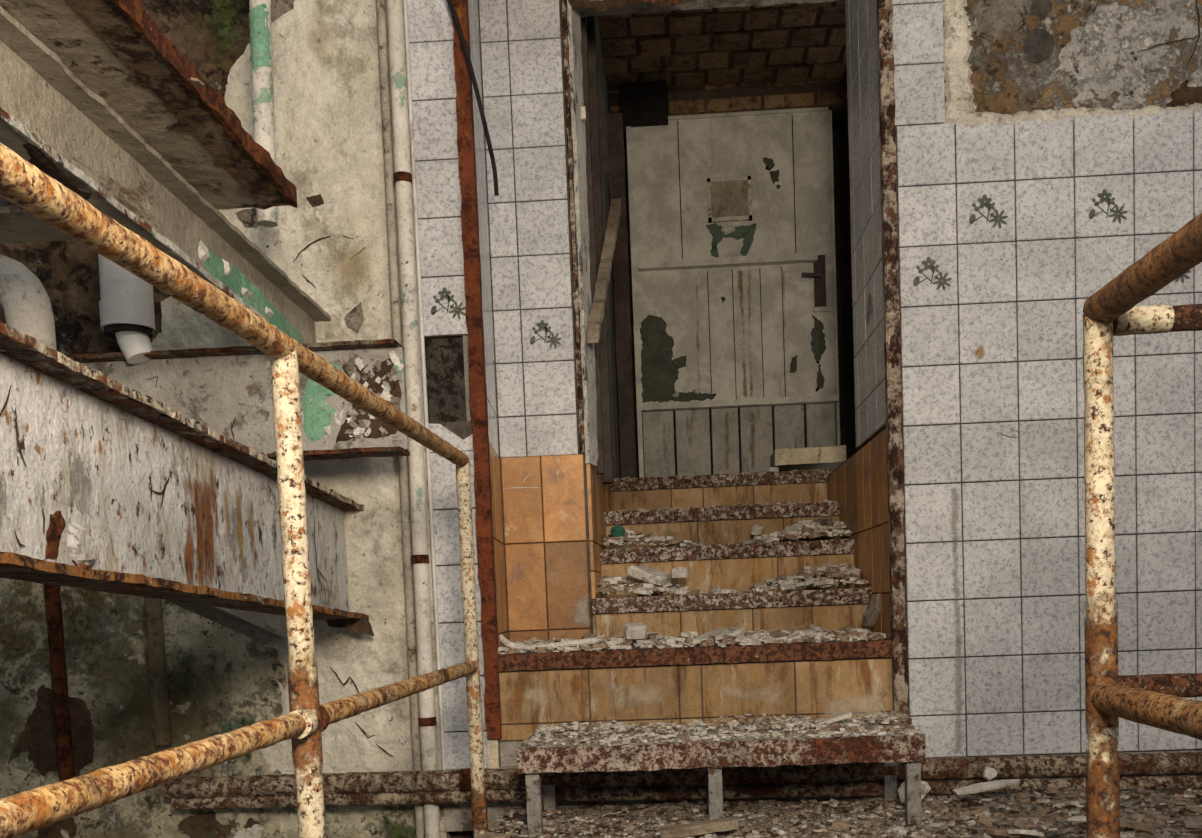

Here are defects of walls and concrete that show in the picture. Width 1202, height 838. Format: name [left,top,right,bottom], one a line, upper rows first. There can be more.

spalling [940,0,1202,127]
corrosion [66,0,297,209]
spalling [306,194,324,223]
peeling [706,223,756,257]
peeling [301,378,398,443]
spalling [345,302,364,332]
peeling [329,350,404,410]
peeling [425,337,467,423]
peeling [640,315,716,403]
peeling [811,316,826,390]
corrosion [0,472,285,608]
corrosion [311,584,369,620]